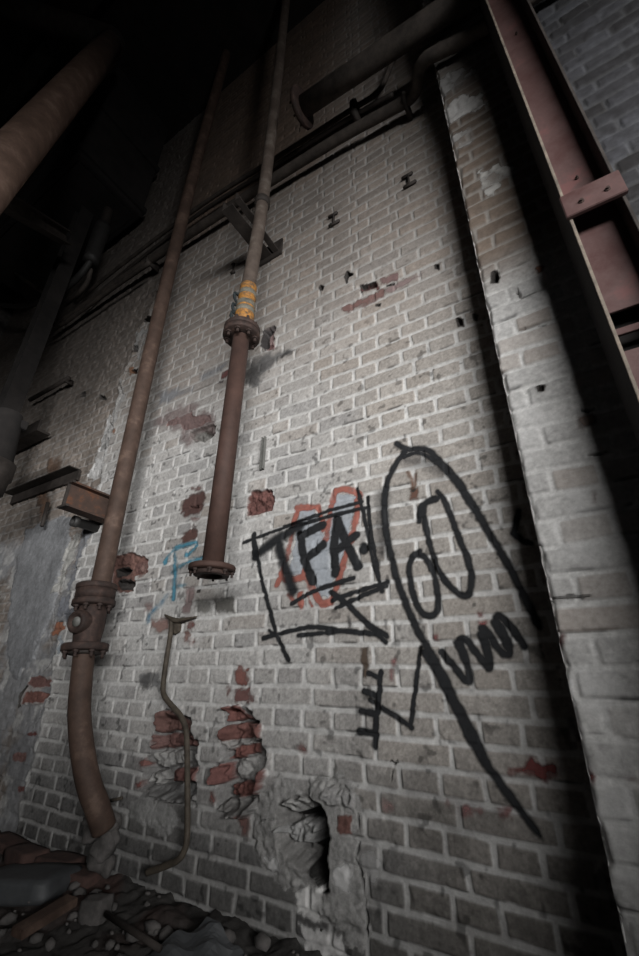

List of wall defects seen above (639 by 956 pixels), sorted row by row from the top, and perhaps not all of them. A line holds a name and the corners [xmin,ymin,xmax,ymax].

peeling [342,273,416,312]
spalling [166,410,216,443]
spalling [246,488,275,517]
spalling [112,551,153,594]
spalling [136,665,373,954]